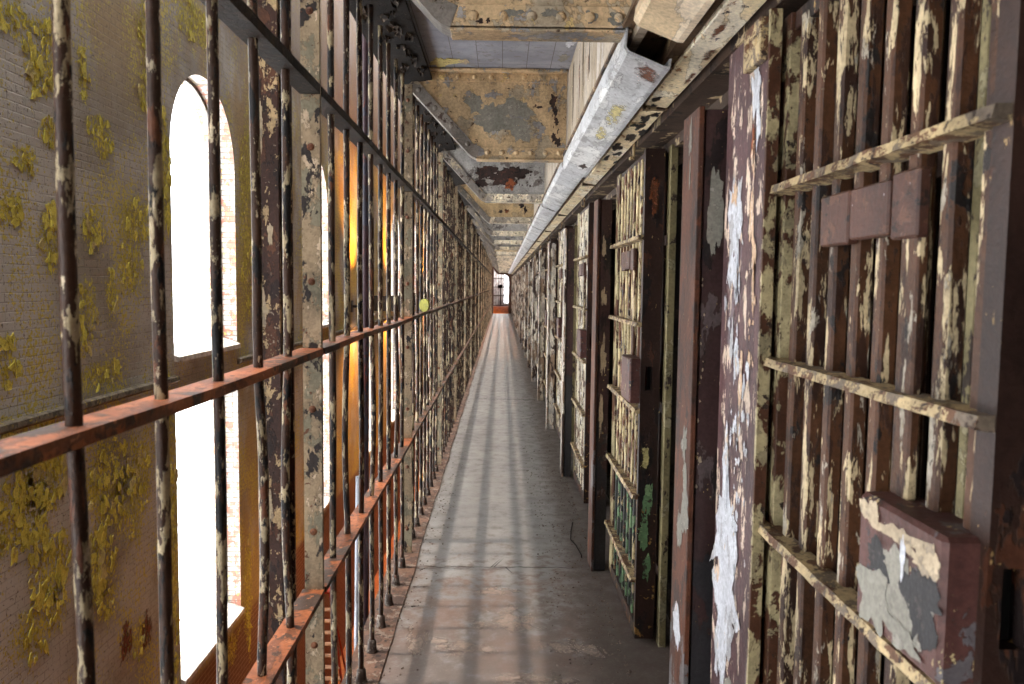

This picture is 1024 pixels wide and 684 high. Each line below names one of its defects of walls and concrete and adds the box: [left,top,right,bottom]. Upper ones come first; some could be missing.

peeling [463,93,561,147]
peeling [751,67,761,151]
peeling [475,166,540,191]
peeling [706,167,756,684]
peeling [677,419,702,547]
peeling [637,484,653,582]
peeling [856,498,942,663]